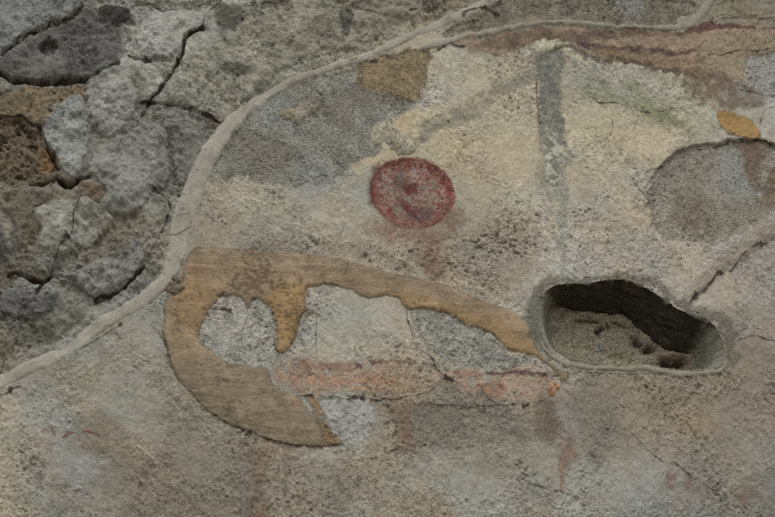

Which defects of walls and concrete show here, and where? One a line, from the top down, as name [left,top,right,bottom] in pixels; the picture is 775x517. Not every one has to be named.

crack [43,37,58,49]
crack [51,195,82,274]
crack [151,187,189,250]
spalling [646,137,775,242]
crack [689,238,773,303]
crack [299,311,544,408]
crack [632,434,721,496]